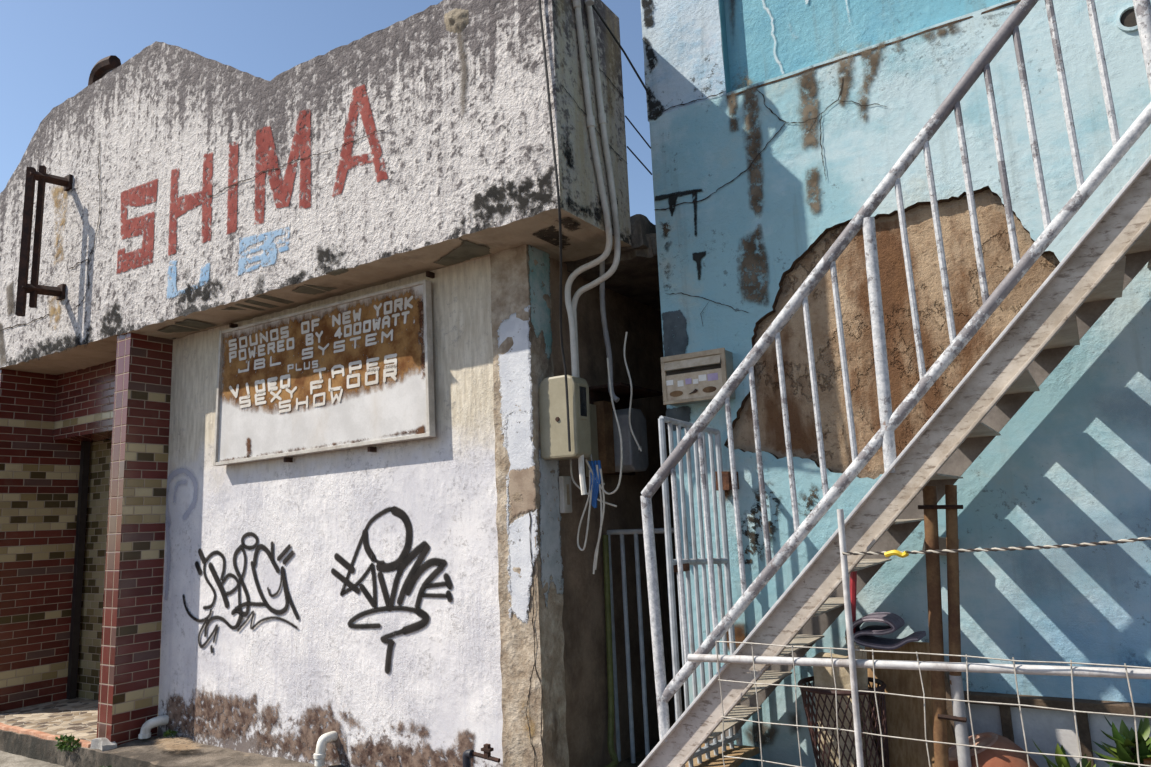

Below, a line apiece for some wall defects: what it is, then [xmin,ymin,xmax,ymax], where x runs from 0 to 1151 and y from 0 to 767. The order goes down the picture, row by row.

crack [762,0,784,74]
crack [652,78,887,210]
leakage [457,166,603,230]
leakage [0,282,122,365]
leakage [175,273,224,307]
leakage [290,243,345,284]
crack [672,292,748,324]
spalling [733,189,1059,479]
peeling [496,217,581,624]
leakage [741,490,780,565]
leakage [799,487,822,516]
leakage [159,736,200,750]